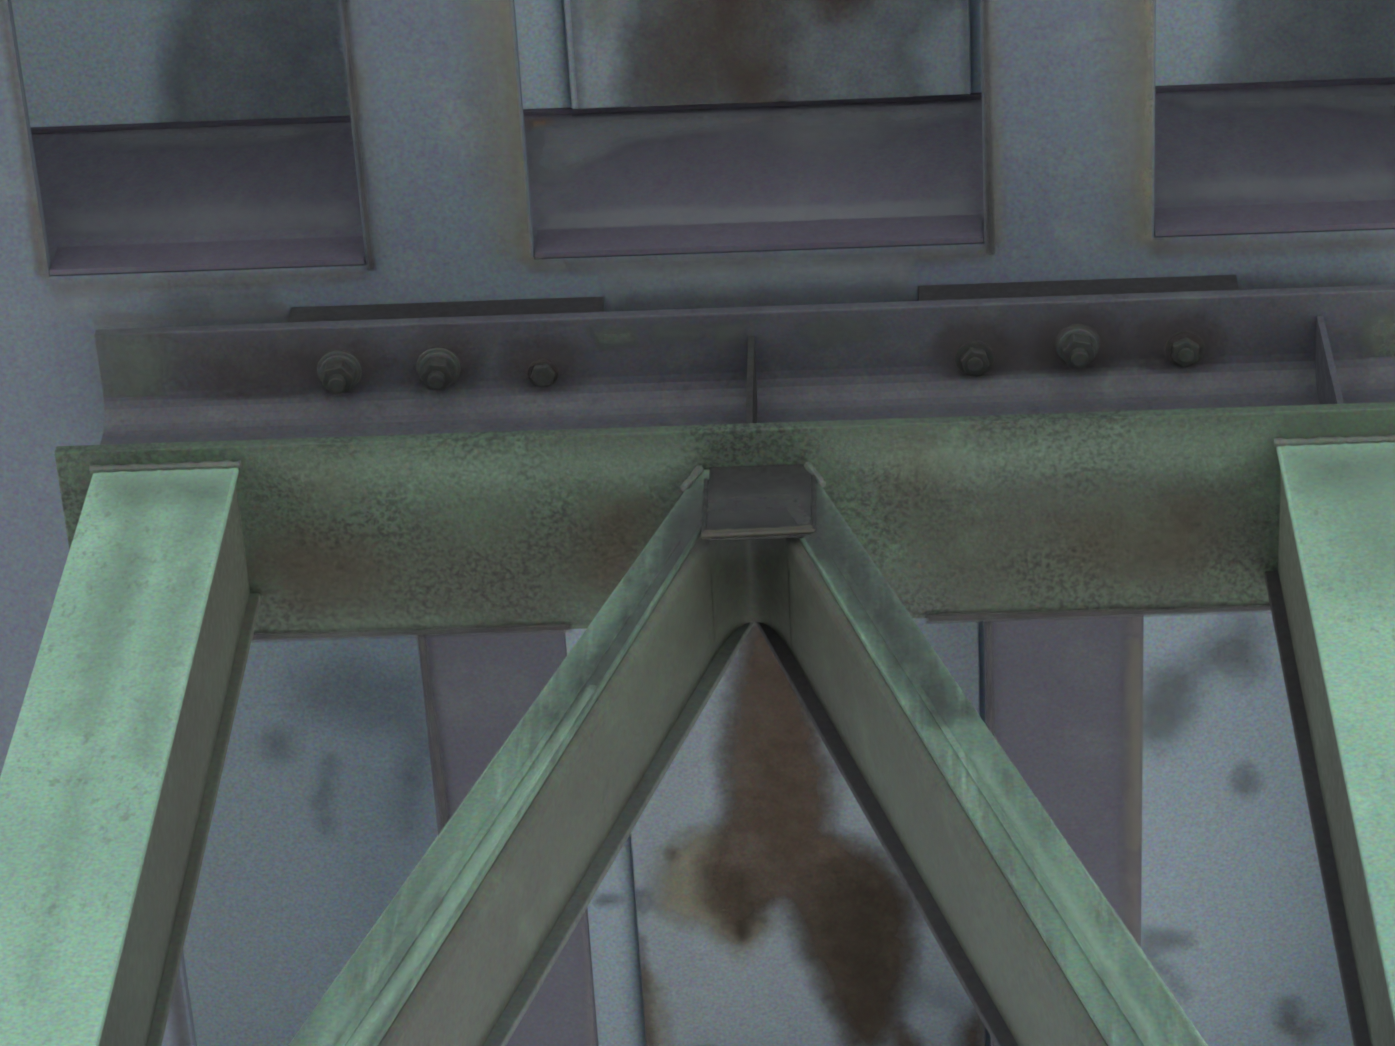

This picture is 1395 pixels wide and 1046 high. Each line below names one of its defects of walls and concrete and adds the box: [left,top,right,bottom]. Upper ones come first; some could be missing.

rust [625,0,941,107]
rust [983,0,994,254]
rust [661,626,917,1046]